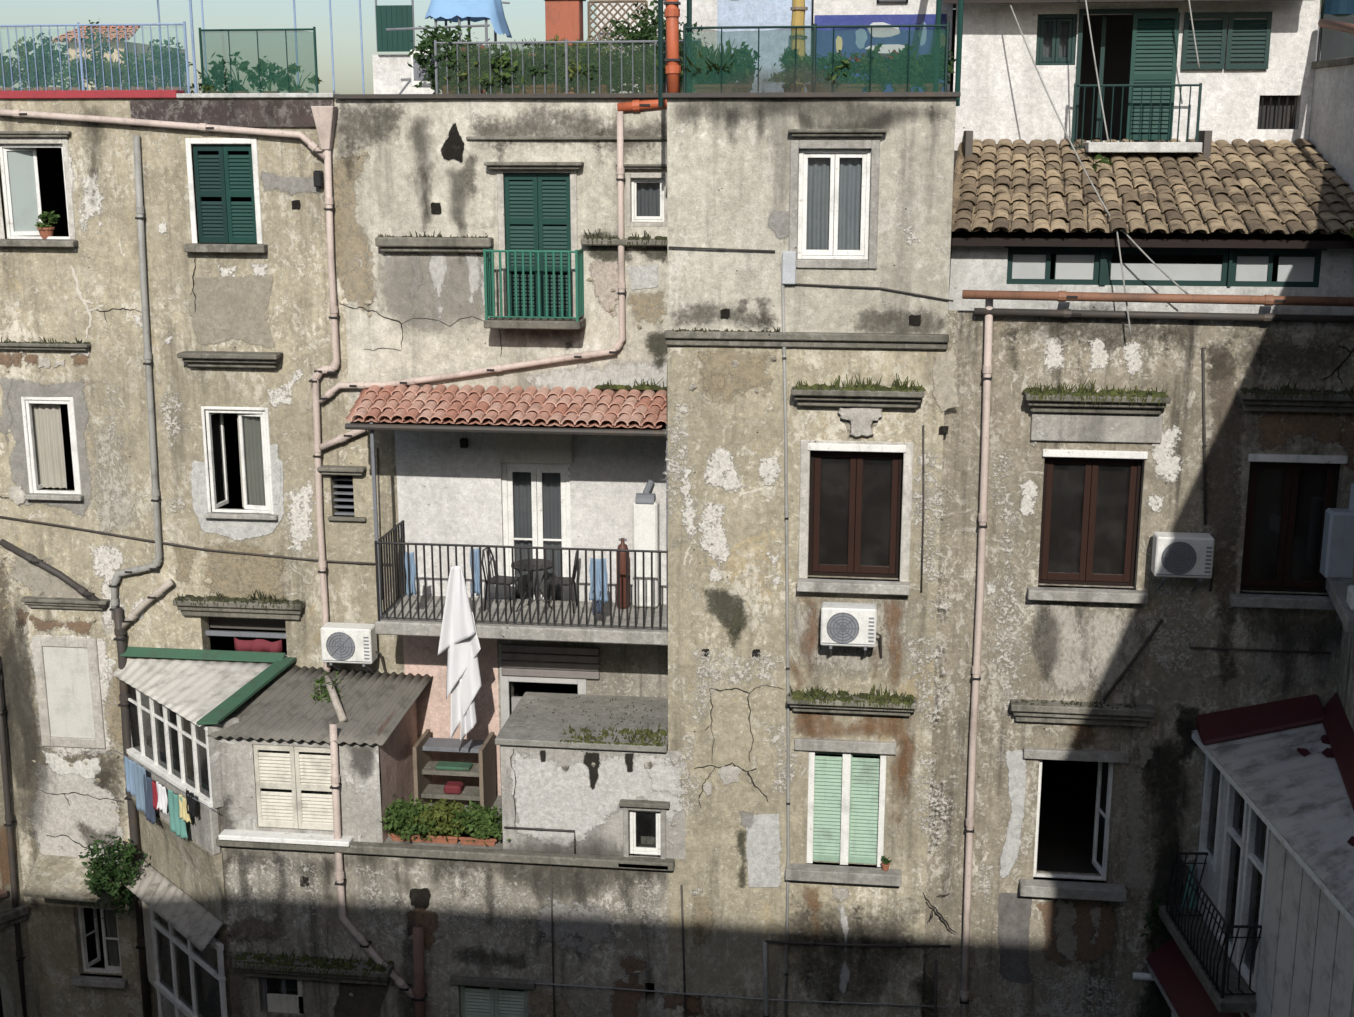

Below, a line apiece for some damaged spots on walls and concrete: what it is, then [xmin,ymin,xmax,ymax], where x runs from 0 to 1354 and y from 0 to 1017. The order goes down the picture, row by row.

spalling [441,123,464,163]
spalling [430,202,441,214]
crack [70,265,140,339]
crack [338,300,502,357]
peeling [1042,335,1067,373]
peeling [1087,337,1146,375]
peeling [662,346,777,583]
flaking render [174,444,317,600]
leakage [705,590,747,645]
flaking render [0,541,145,878]
crack [694,685,782,807]
leakage [1138,705,1199,1017]